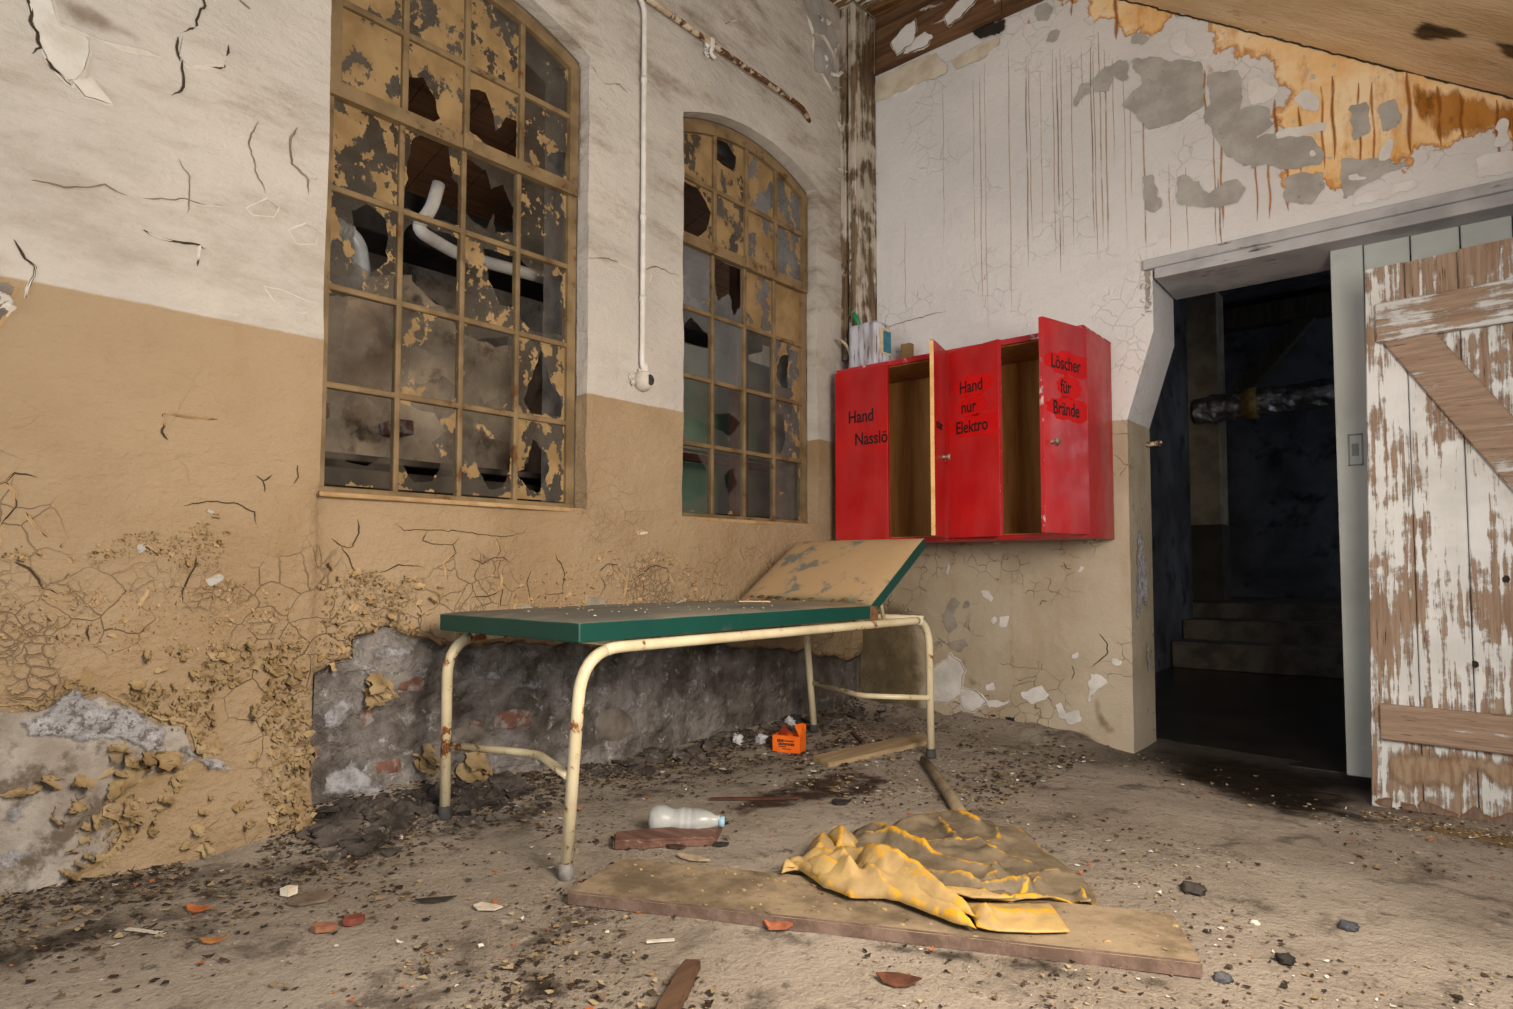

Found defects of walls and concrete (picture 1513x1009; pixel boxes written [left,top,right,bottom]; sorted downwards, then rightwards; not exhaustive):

peeling [26,0,230,107]
peeling [875,36,1003,103]
crack [248,122,317,194]
peeling [1072,33,1408,214]
crack [32,159,226,266]
spalling [0,279,18,327]
crack [0,472,58,595]
crack [137,557,197,609]
crack [185,465,299,522]
crack [331,519,675,608]
flaking render [0,508,861,902]
peeling [917,590,1122,725]